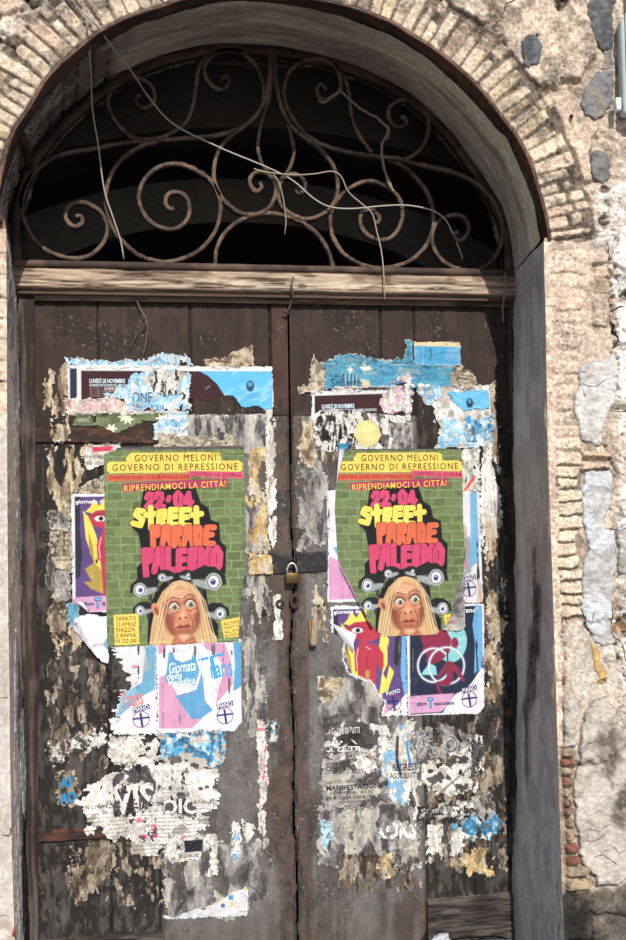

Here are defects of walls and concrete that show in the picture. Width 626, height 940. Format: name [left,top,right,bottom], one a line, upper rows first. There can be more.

flaking render [561,617,569,660]
spalling [589,640,607,684]
flaking render [560,696,626,891]